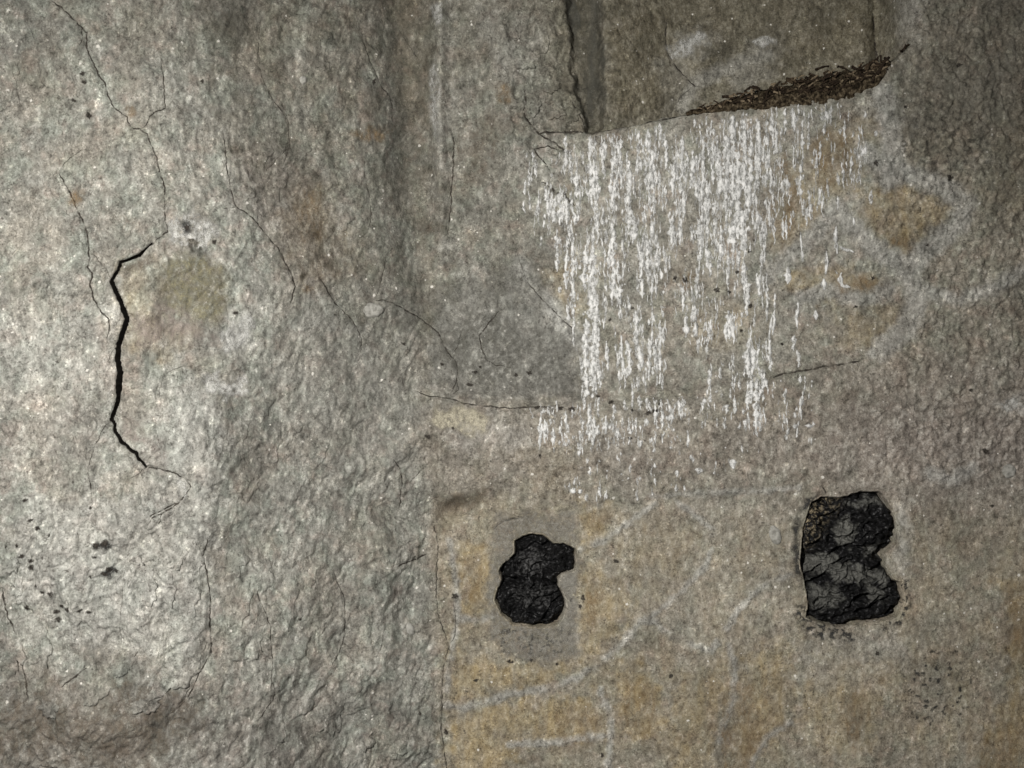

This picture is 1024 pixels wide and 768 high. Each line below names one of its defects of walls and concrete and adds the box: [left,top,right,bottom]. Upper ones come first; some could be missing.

crack [53,2,191,525]
water stain [522,0,878,504]
hole [493,532,585,646]
hole [798,489,906,631]